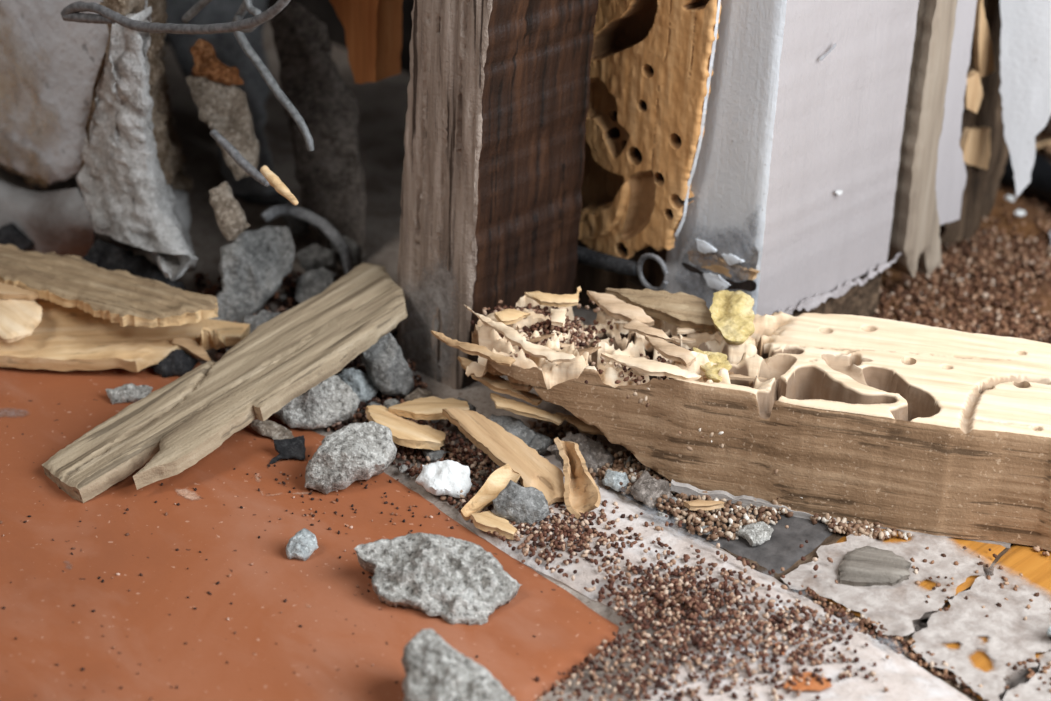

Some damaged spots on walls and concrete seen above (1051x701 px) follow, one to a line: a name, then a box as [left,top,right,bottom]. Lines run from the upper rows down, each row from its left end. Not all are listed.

spalling [76,0,198,281]